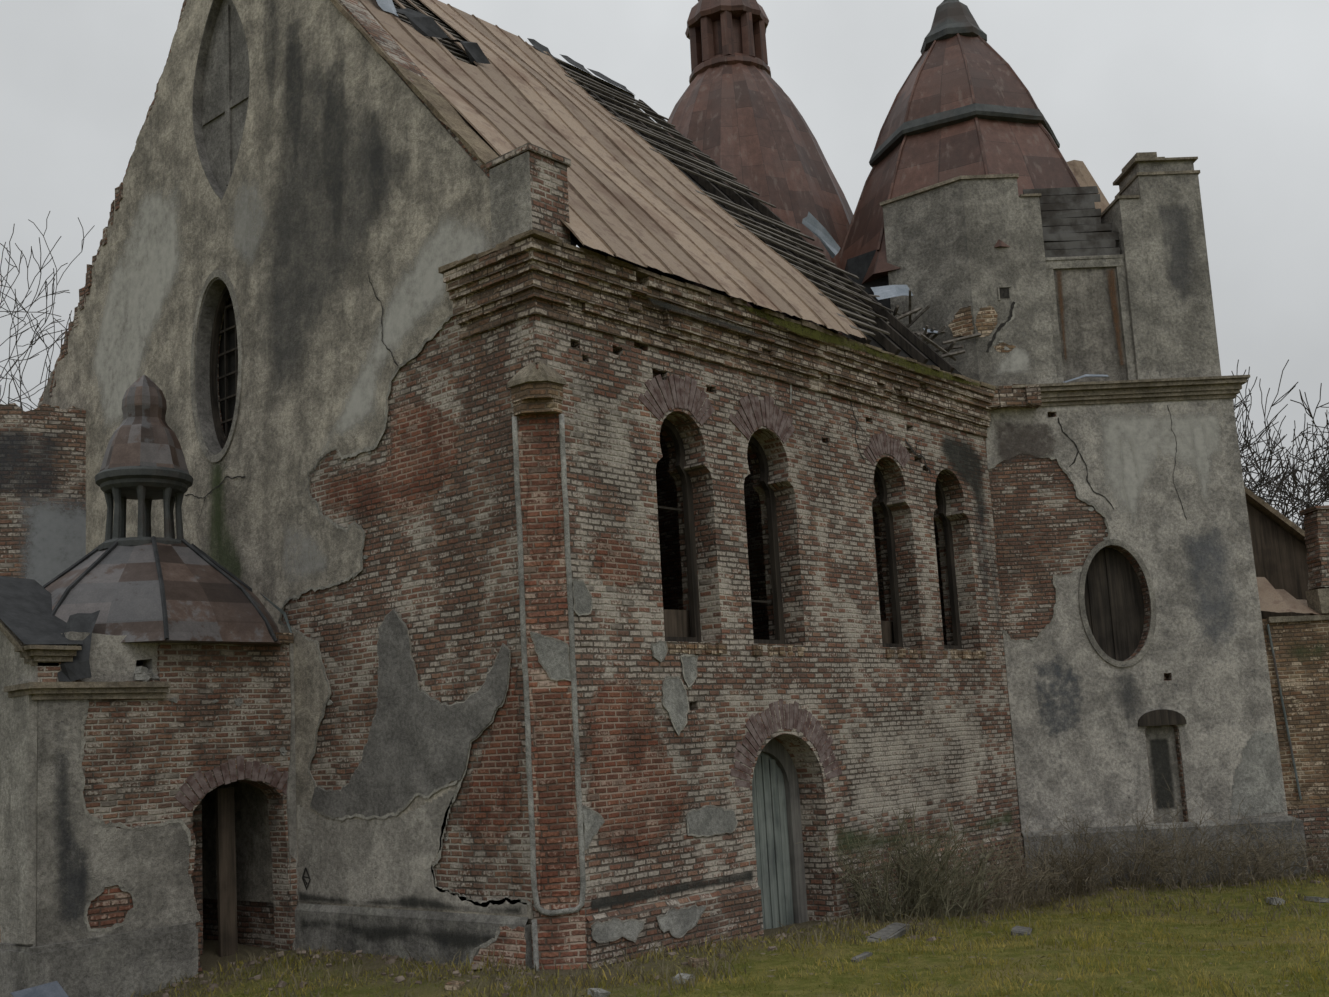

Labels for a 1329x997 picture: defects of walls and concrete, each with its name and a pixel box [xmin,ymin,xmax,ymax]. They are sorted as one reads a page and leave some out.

damp [327,219,488,443]
crack [986,301,1019,353]
peeling [988,414,1110,643]
crack [1058,417,1114,509]
peeling [78,697,287,846]
peeling [278,314,738,970]
damp [1037,662,1082,733]
peeling [83,882,137,933]